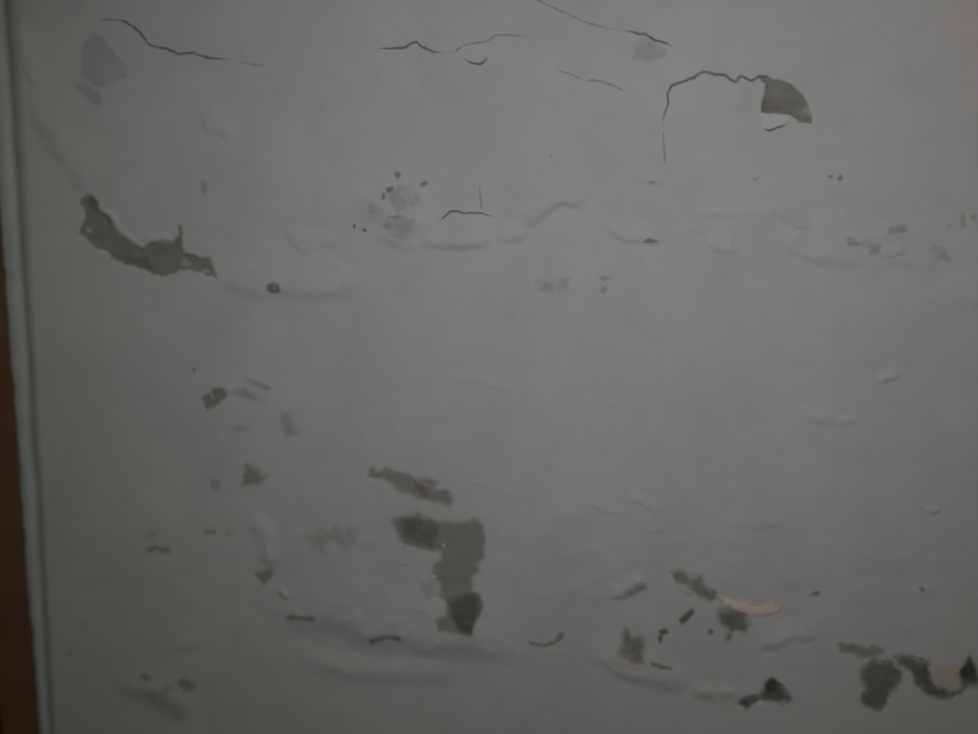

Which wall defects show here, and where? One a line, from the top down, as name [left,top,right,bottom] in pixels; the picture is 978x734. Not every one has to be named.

crack [121,20,220,59]
crack [385,41,433,52]
flaking render [759,76,811,131]
flaking render [80,196,216,277]
peeling [203,389,226,409]
peeling [452,596,478,632]
flaking render [675,573,781,629]
flaking render [741,680,788,706]
flaking render [863,658,978,709]